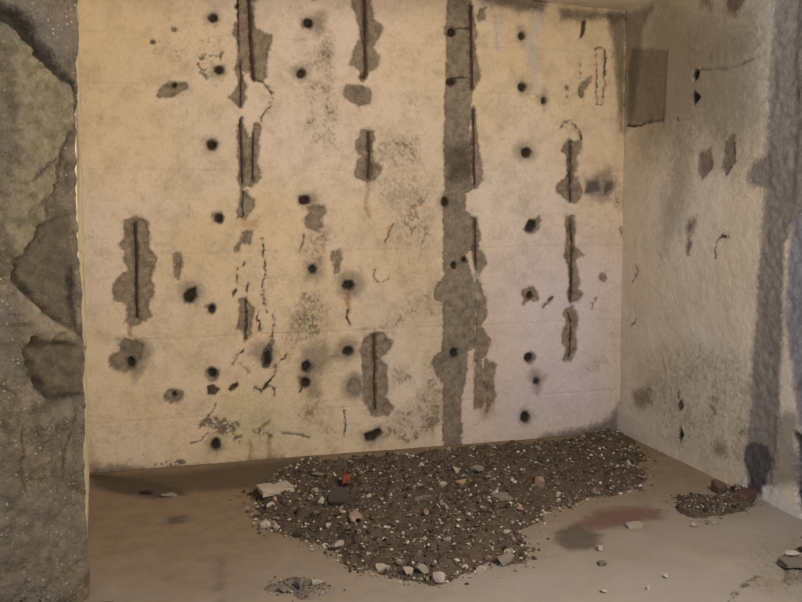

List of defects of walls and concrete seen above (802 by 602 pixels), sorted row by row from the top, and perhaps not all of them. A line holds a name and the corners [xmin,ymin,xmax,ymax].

spalling [343,0,382,106]
spalling [469,5,487,89]
spalling [229,0,272,220]
spalling [355,129,381,181]
spalling [472,108,483,189]
spalling [556,140,583,203]
spalling [109,339,143,372]
spalling [112,217,157,326]
crack [256,244,287,395]
spalling [347,333,393,417]
spalling [473,219,496,413]
spalling [562,215,583,361]